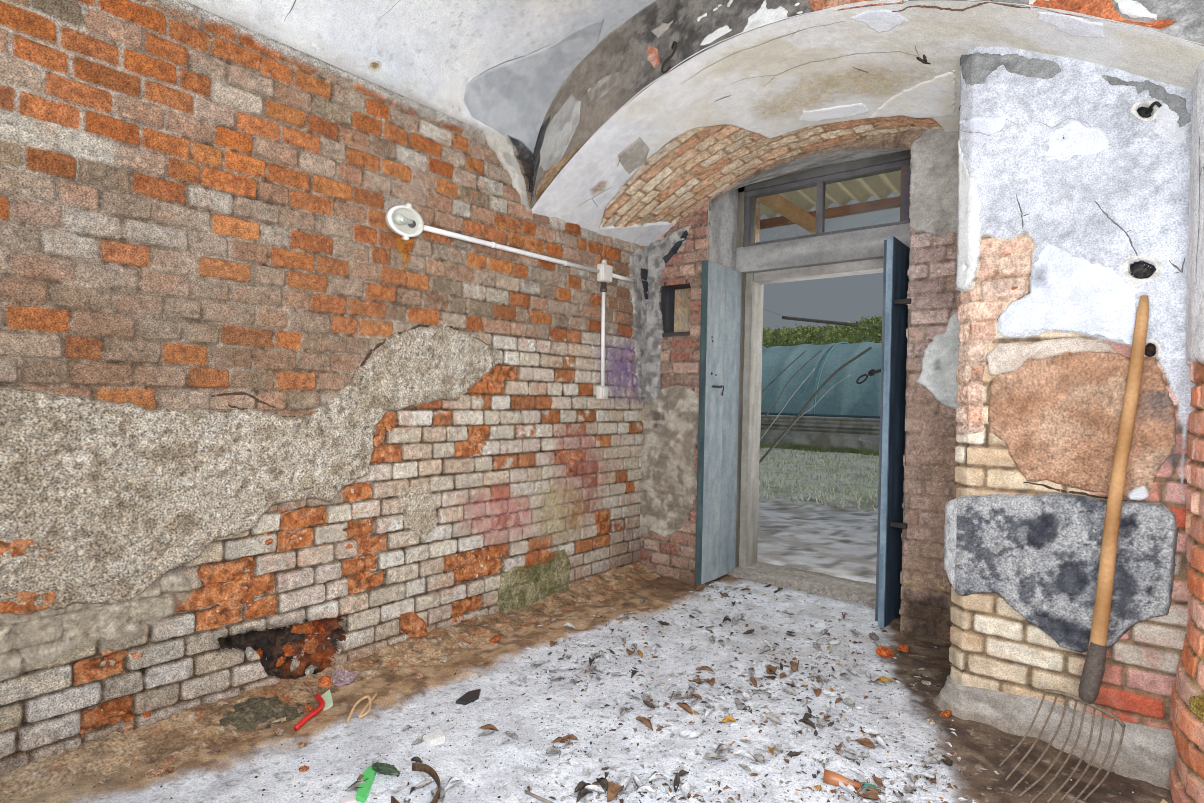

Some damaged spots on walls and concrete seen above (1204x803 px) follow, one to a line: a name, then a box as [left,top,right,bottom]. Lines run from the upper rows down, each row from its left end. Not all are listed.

peeling [700,0,909,45]
flaking render [1027,0,1176,38]
peeling [535,72,623,199]
peeling [1101,75,1191,144]
crack [1095,137,1204,274]
corrosion [396,237,414,268]
flaking render [600,52,1177,500]
spalling [371,411,427,464]
spalling [454,425,489,457]
spalling [444,528,509,585]
spalling [173,505,387,680]
spalling [80,695,152,739]